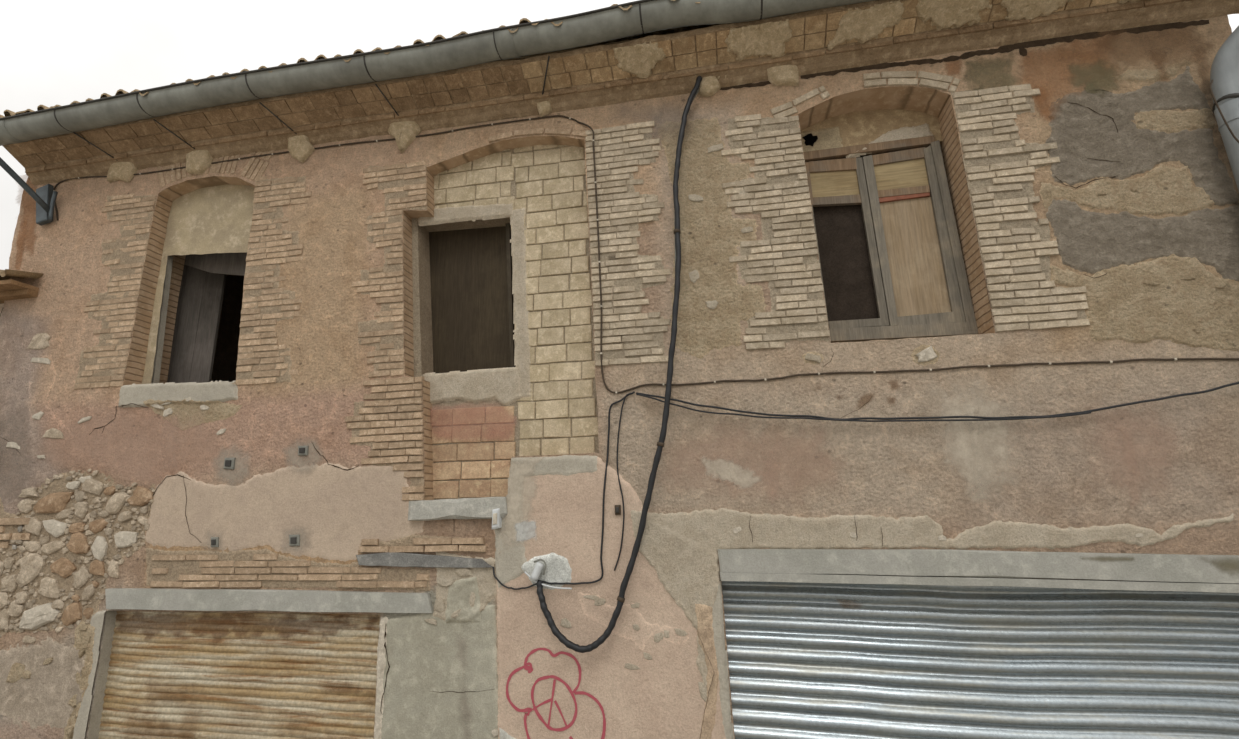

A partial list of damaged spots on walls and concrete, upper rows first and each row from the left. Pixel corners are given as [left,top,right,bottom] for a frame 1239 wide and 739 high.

flaking render [613,42,666,79]
flaking render [725,19,792,61]
spalling [1134,108,1216,133]
spalling [1039,163,1215,216]
crack [148,474,194,536]